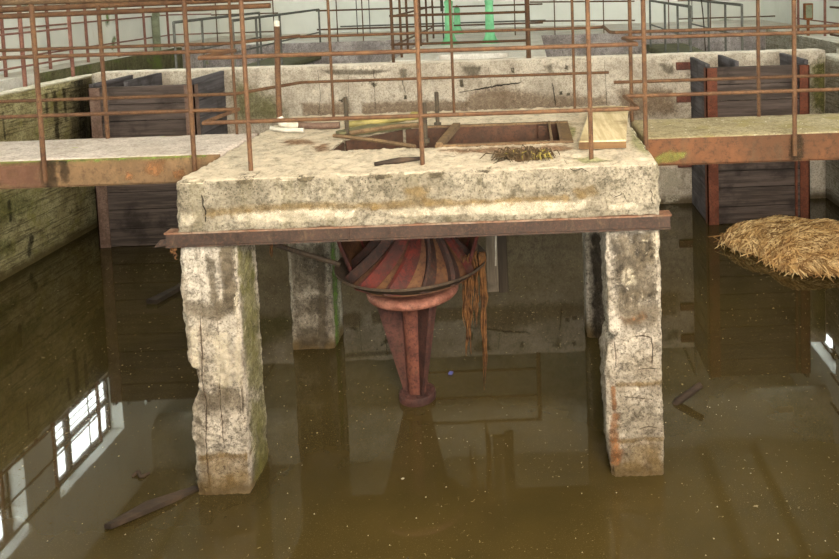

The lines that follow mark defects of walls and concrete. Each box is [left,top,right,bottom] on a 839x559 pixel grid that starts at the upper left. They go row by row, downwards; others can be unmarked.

crack [459,82,521,93]
corrosion [789,135,804,161]
corrosion [0,161,69,188]
water stain [190,246,240,319]
crack [200,319,225,488]
water stain [199,388,244,410]
corrosion [609,386,623,465]